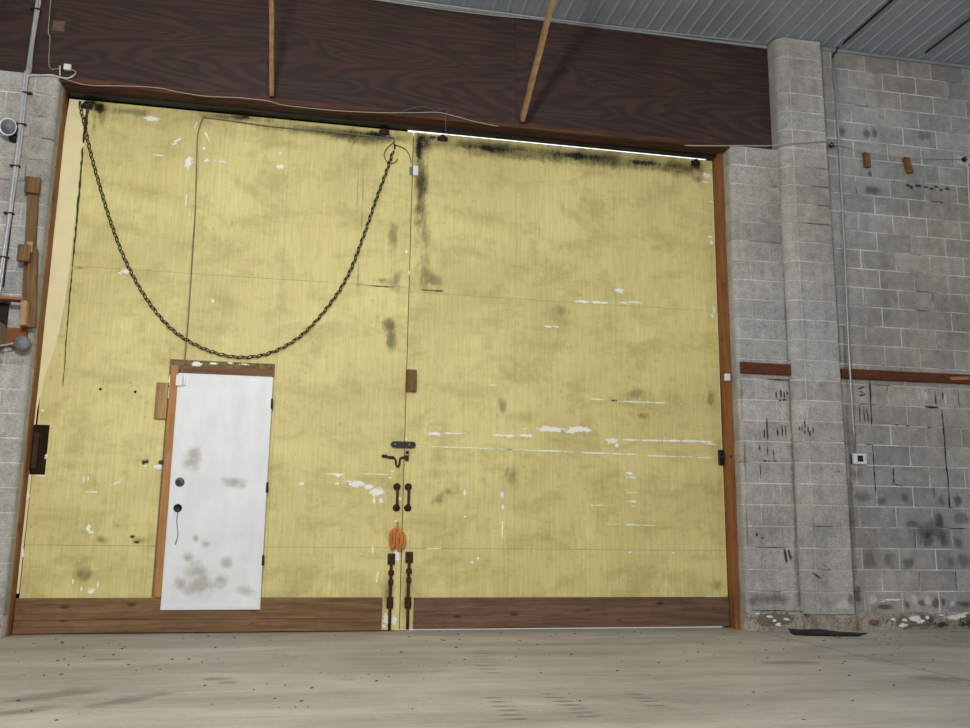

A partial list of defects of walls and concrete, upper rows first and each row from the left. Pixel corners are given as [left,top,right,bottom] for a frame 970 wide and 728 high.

leakage [329,131,386,140]
leakage [417,135,436,158]
leakage [459,142,518,152]
leakage [555,151,618,164]
leakage [633,160,699,169]
leakage [416,172,425,210]
peeling [574,288,642,304]
peeling [406,425,717,459]
peeling [324,470,394,505]
spalling [754,611,796,626]
spalling [883,612,970,630]